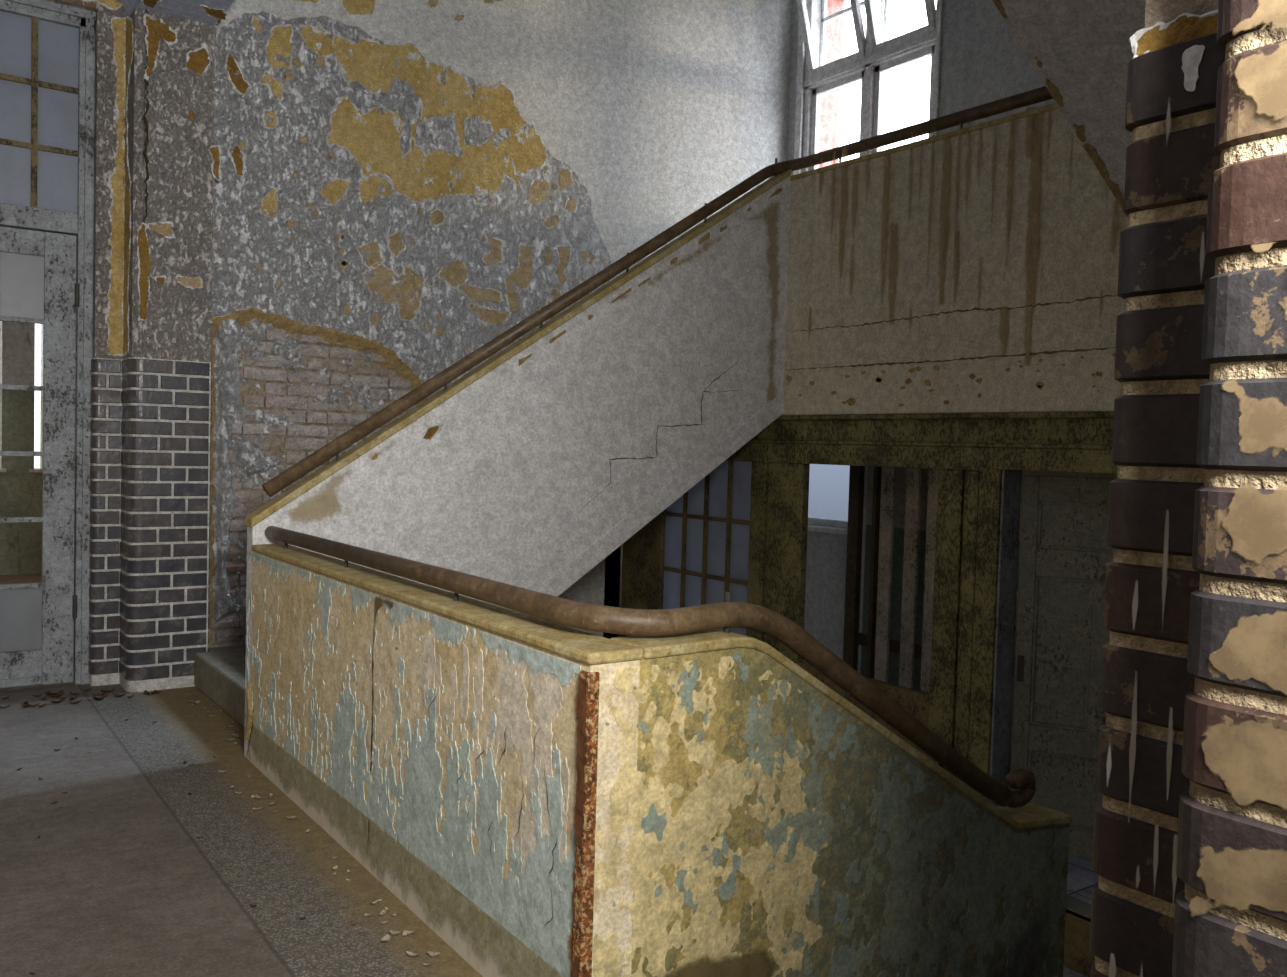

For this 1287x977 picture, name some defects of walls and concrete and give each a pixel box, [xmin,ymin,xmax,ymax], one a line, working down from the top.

crack [142,9,150,231]
spalling [1128,10,1218,92]
spalling [611,277,651,303]
damp [820,147,910,323]
damp [910,107,1051,364]
peeling [83,0,616,977]
crack [578,363,744,513]
crack [368,608,376,772]
corrosion [574,678,586,852]
corrosion [568,873,580,977]